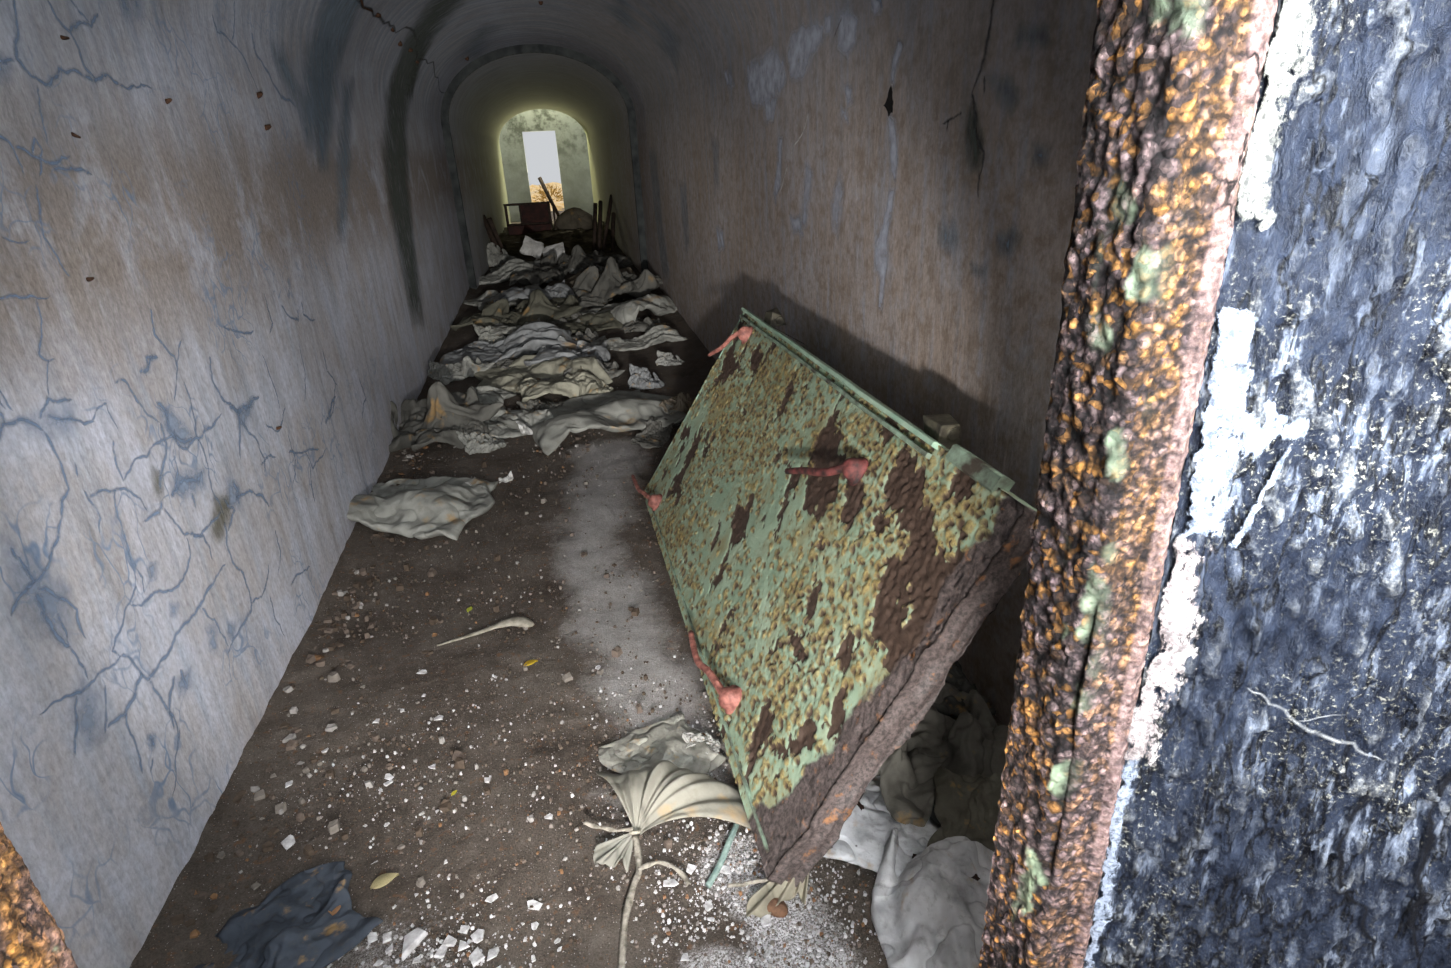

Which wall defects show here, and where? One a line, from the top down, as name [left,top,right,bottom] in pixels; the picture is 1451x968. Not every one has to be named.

crack [357,0,446,93]
leakage [384,0,459,316]
crack [943,0,994,194]
crack [0,0,366,793]
flaking render [1084,307,1309,968]